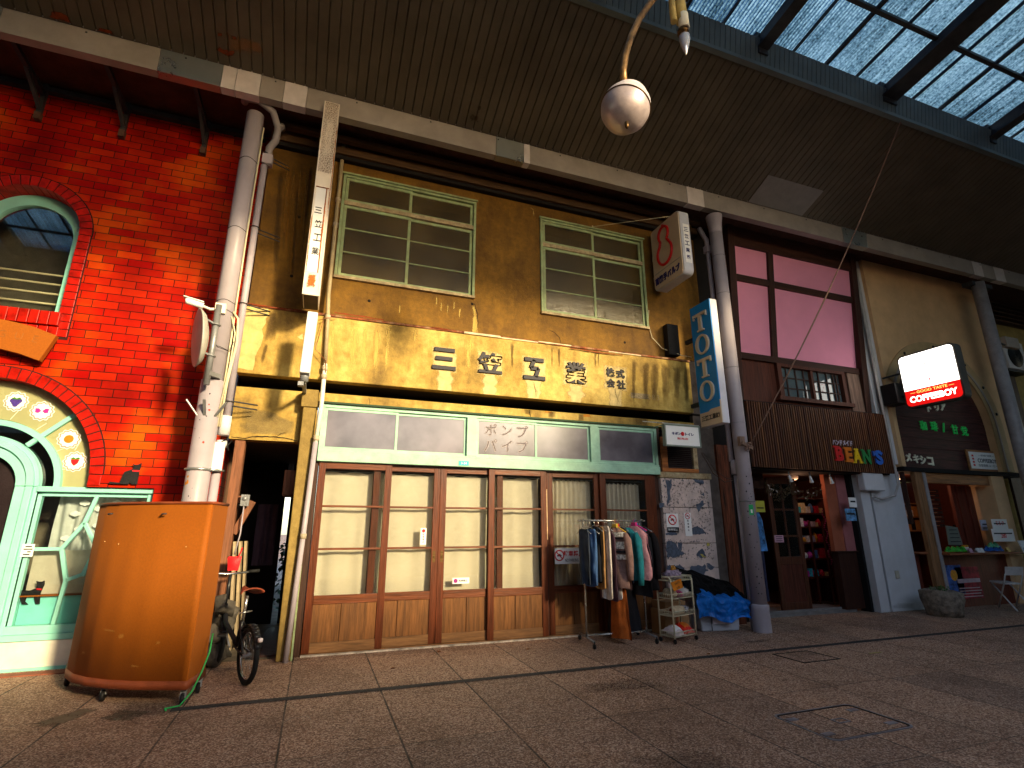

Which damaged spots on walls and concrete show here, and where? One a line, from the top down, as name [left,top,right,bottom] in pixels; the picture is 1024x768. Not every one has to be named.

leakage [437,369,453,391]
leakage [463,374,497,409]
leakage [526,379,541,413]
leakage [568,385,585,419]
leakage [608,365,687,406]
peeling [659,478,714,584]